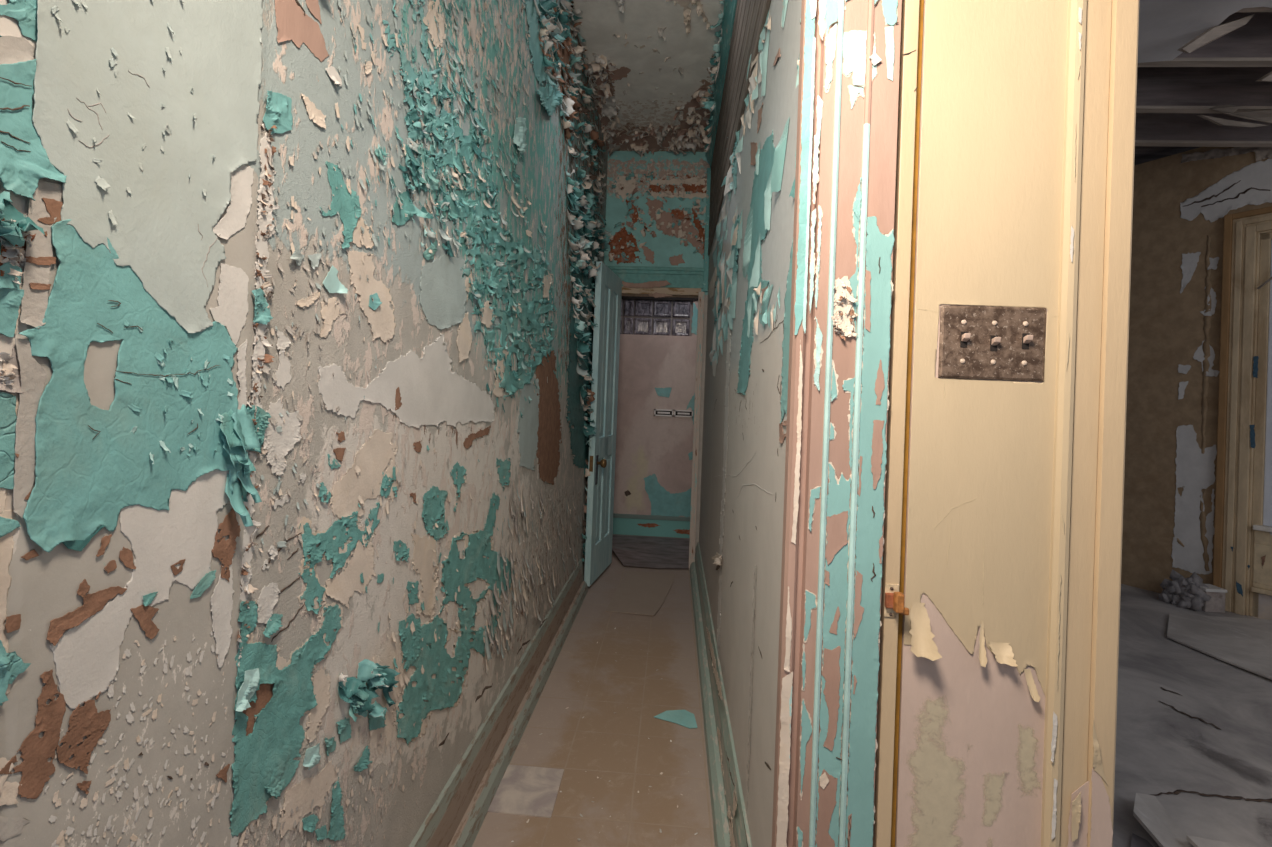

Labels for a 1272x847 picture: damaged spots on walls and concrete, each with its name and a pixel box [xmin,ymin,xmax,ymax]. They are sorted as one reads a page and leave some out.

peeling [0,0,898,847]